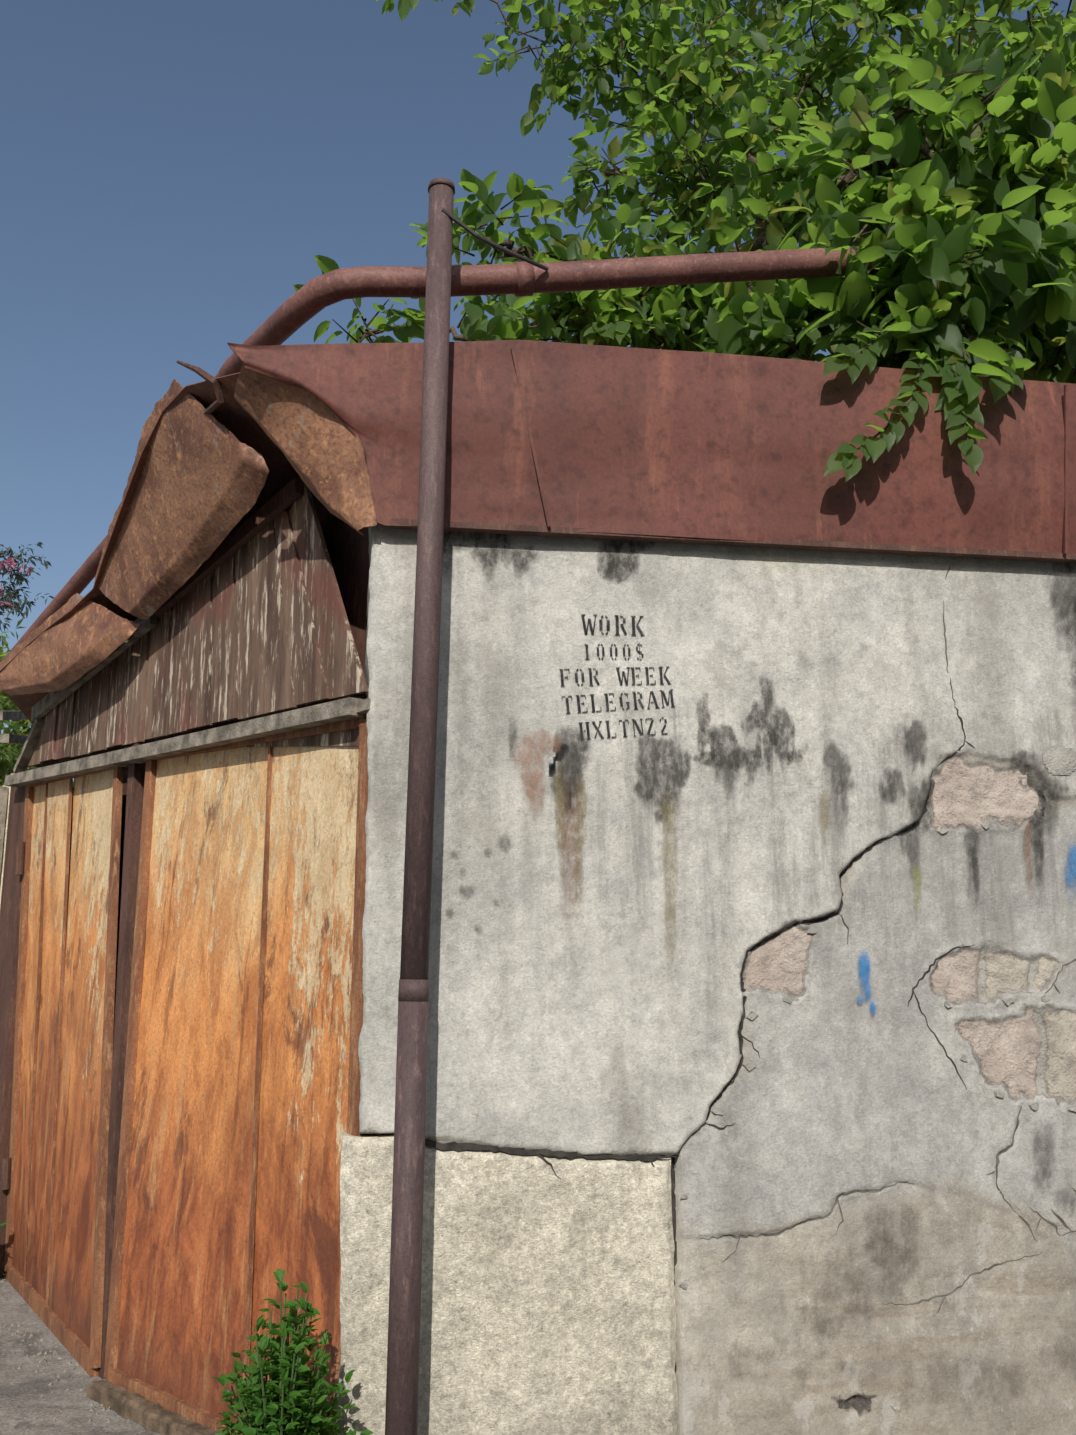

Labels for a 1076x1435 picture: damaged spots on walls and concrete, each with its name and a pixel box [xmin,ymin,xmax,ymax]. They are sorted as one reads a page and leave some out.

leakage [443,532,534,570]
leakage [601,540,653,582]
leakage [635,680,802,819]
leakage [824,744,850,813]
leakage [882,769,935,862]
leakage [905,721,925,762]
spalling [928,755,1045,835]
crack [425,567,975,1303]
spalling [740,921,813,1004]
crack [1044,958,1076,994]
spalling [929,947,1076,1112]
crack [882,1107,1076,1313]